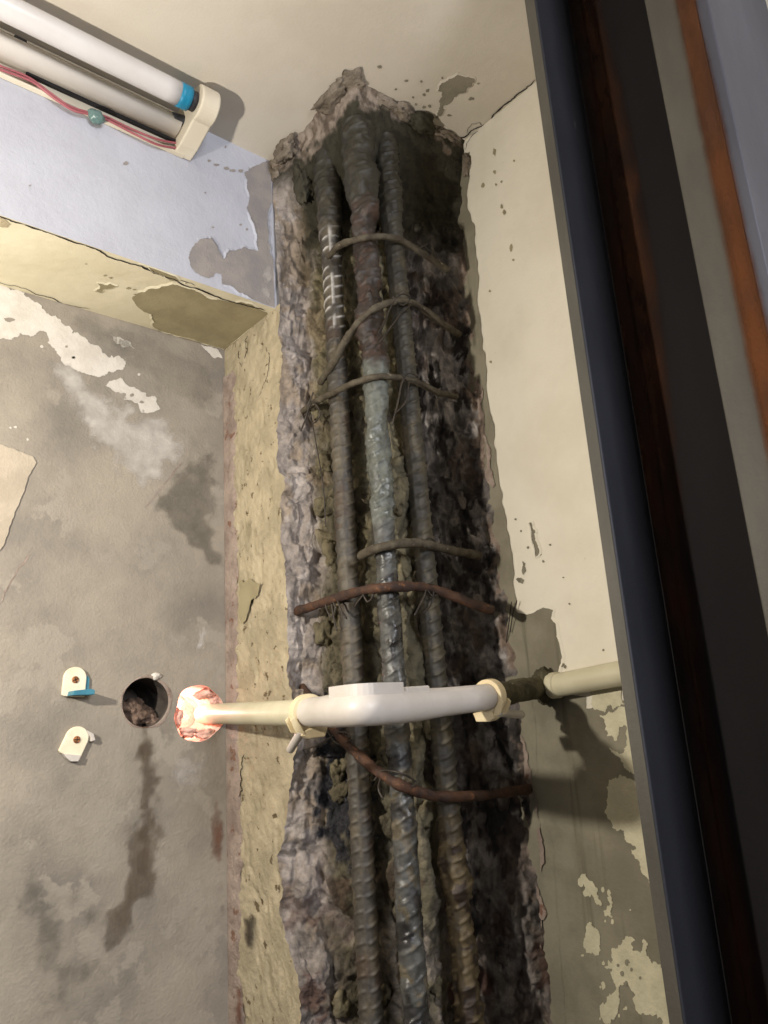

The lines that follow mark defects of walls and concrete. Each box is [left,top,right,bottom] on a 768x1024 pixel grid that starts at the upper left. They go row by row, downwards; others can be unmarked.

crack [460,80,535,149]
peeling [0,285,160,414]
spalling [93,67,566,700]
water stain [115,827,153,929]
spalling [277,727,359,1024]
spalling [367,725,404,1024]
spalling [409,720,455,1024]
peeling [451,695,663,1024]